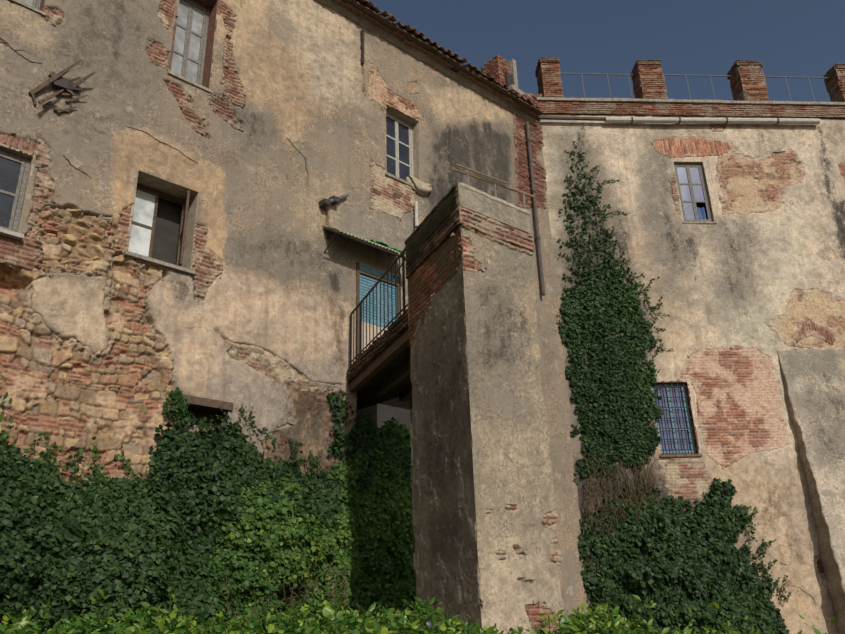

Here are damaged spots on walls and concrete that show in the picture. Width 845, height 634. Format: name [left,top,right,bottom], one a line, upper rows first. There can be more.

flaking render [146,38,171,71]
flaking render [158,0,179,32]
flaking render [165,1,252,140]
flaking render [365,62,423,121]
flaking render [368,161,425,227]
flaking render [513,113,547,209]
flaking render [651,124,805,216]
flaking render [0,131,179,494]
flaking render [191,225,224,300]
flaking render [408,224,533,348]
flaking render [764,287,845,350]
flaking render [658,345,789,503]